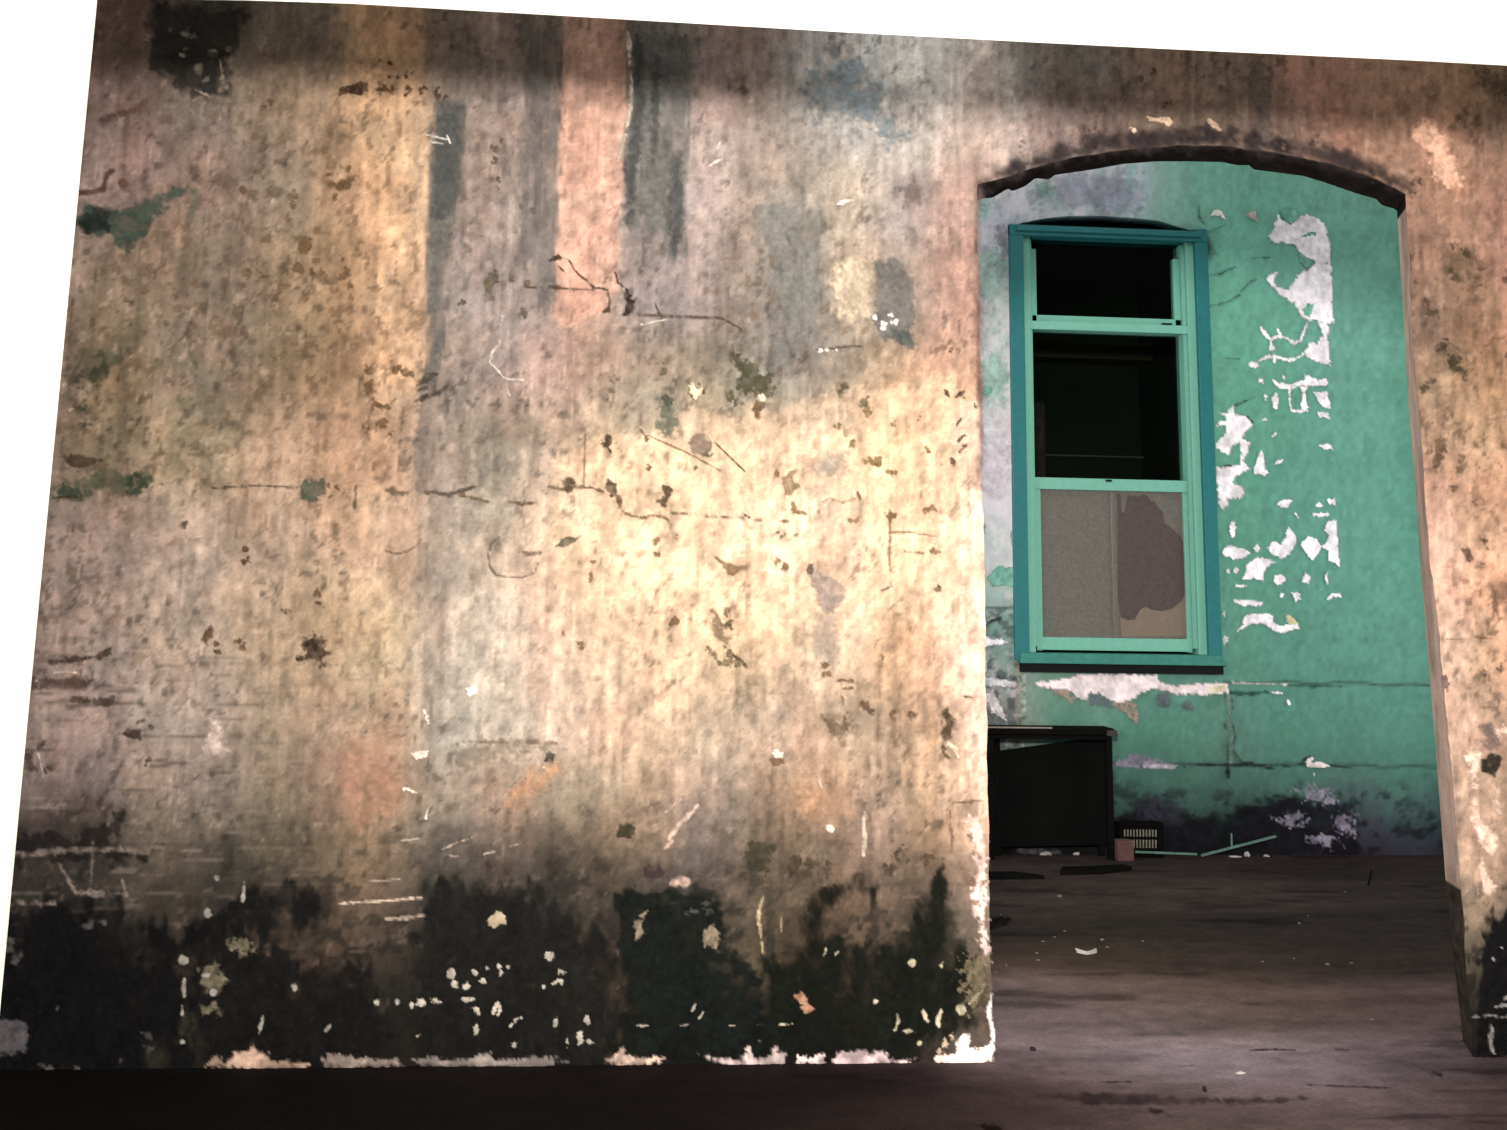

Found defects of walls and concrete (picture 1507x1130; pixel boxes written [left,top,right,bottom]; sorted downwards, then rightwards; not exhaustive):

water stain [142,0,248,128]
water stain [484,23,562,318]
water stain [618,29,700,262]
water stain [386,99,466,495]
water stain [212,478,356,508]
peeling [1216,208,1341,645]
peeling [987,566,1013,587]
flaking render [985,660,1292,725]
water stain [1120,782,1359,855]
water stain [0,809,986,1070]
water stain [1473,907,1507,1058]